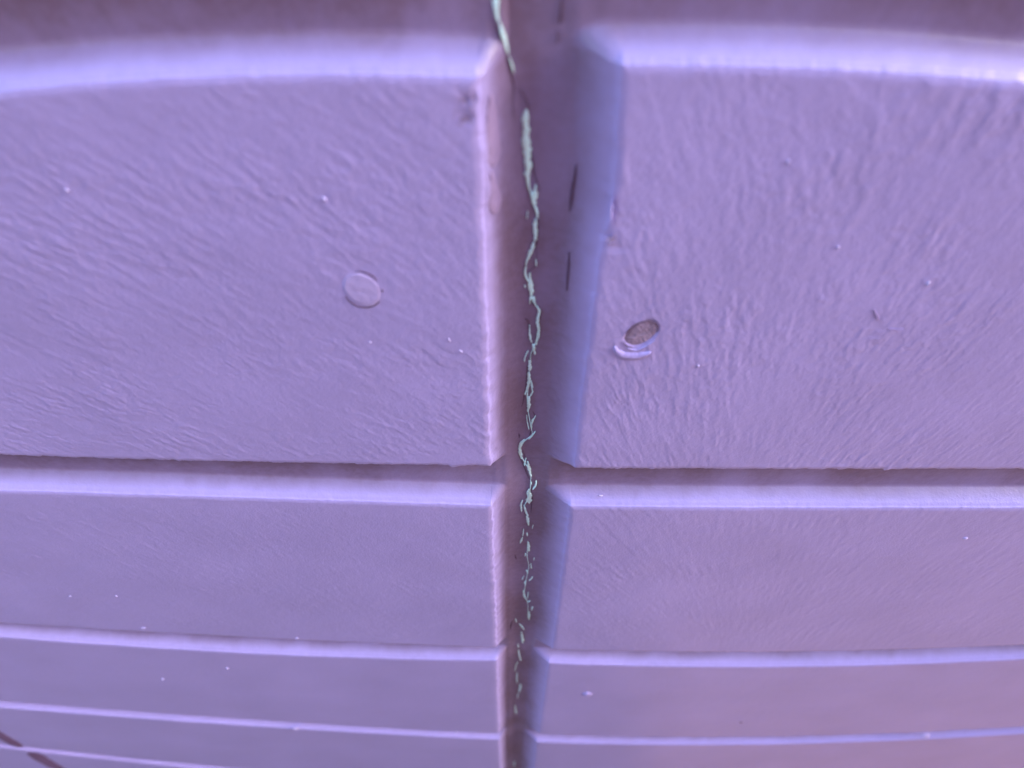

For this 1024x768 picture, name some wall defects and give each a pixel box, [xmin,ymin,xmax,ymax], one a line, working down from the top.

crack [493,0,542,714]
spalling [613,320,659,360]